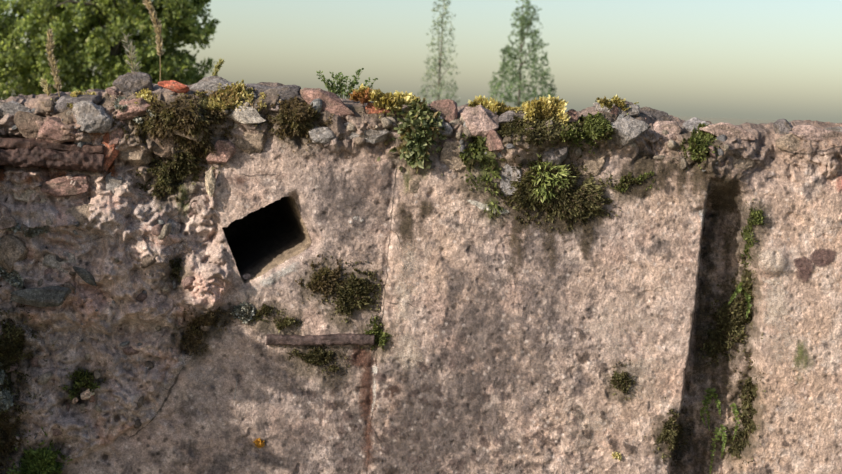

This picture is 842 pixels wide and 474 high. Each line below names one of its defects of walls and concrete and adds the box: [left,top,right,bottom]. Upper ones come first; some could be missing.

crack [380,163,413,322]
water stain [506,194,604,272]
water stain [621,149,750,409]
crack [128,353,193,439]
corrosion [352,345,375,463]
crack [366,350,382,474]
water stain [609,439,635,455]
water stain [666,417,719,474]